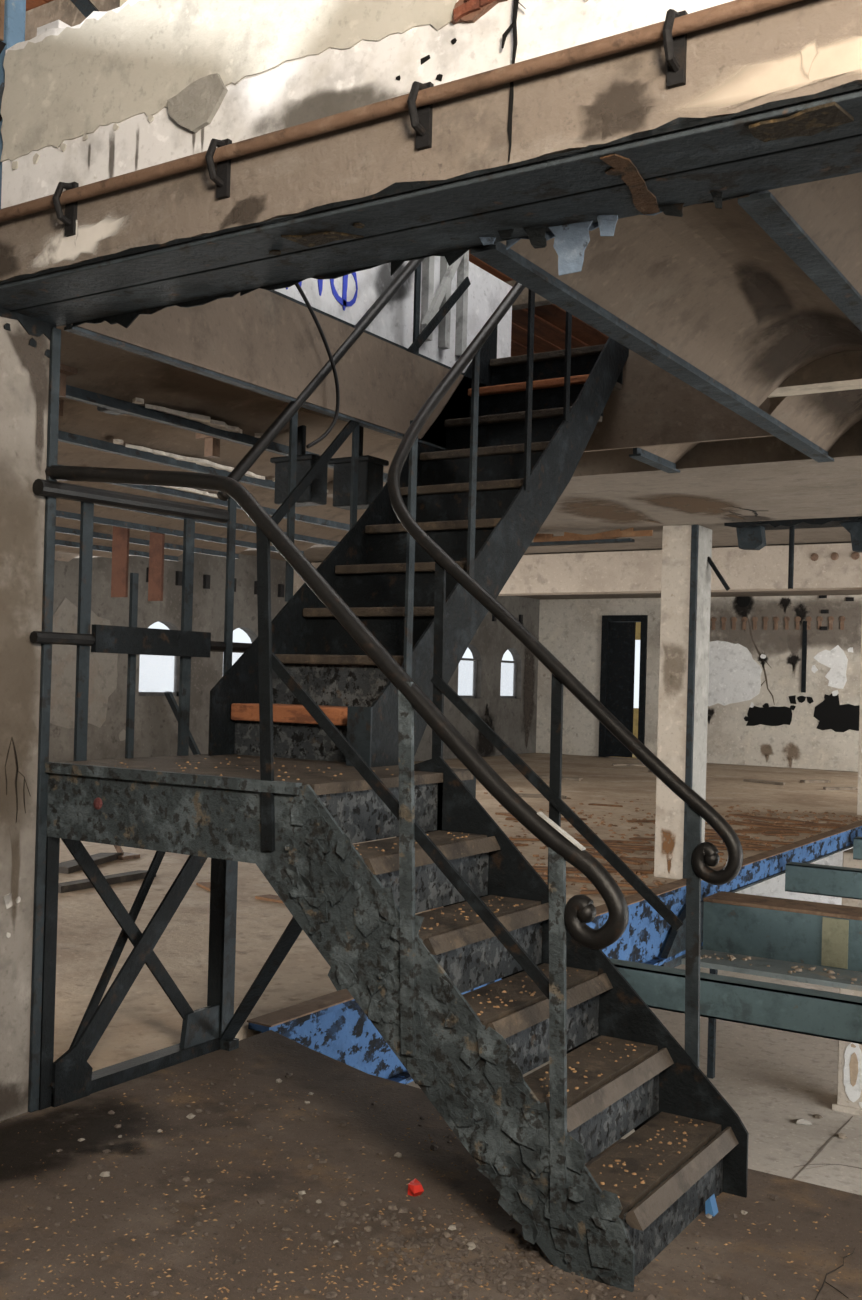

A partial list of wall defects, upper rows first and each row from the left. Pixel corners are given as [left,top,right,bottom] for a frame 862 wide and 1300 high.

flaking render [1,0,508,170]
water stain [584,82,648,138]
flaking render [0,80,862,284]
rust [600,154,660,215]
peeling [73,215,618,328]
flaking render [0,307,56,358]
peeling [708,641,860,732]
crack [815,1249,855,1300]